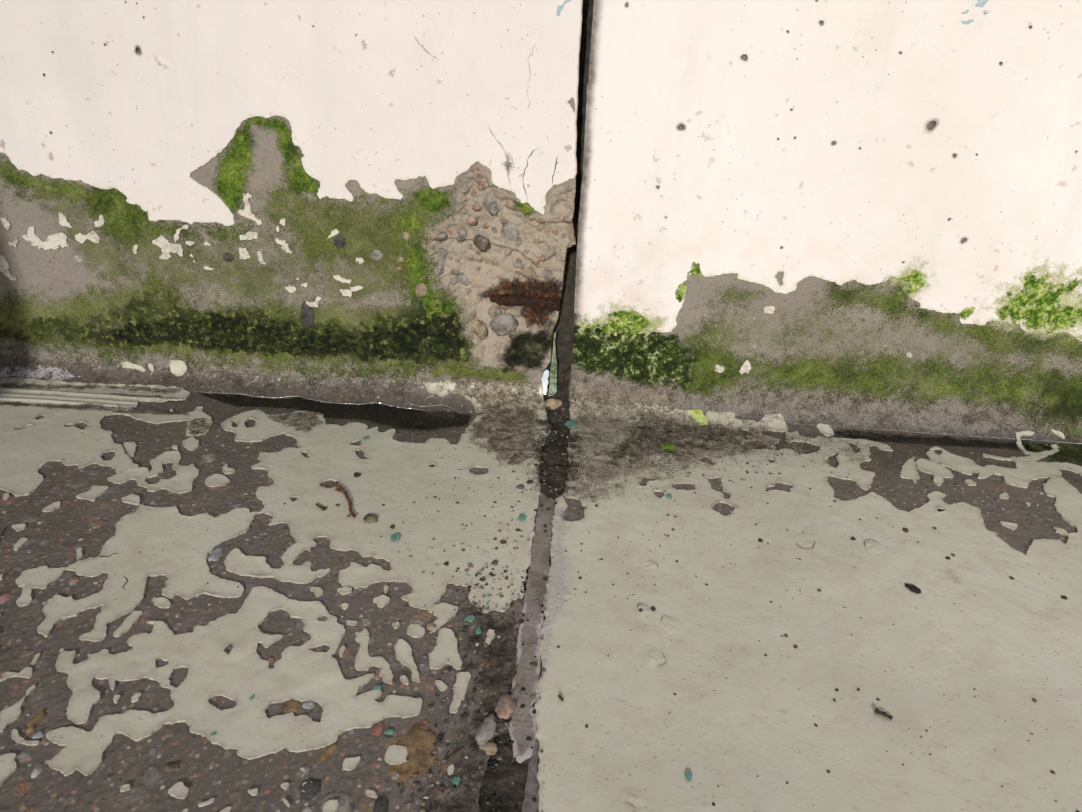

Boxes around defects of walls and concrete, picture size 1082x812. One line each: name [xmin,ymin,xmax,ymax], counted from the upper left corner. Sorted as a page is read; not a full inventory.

peeling [0,115,577,812]
corrosion [481,279,562,327]
peeling [561,497,587,521]
peeling [569,271,1082,555]